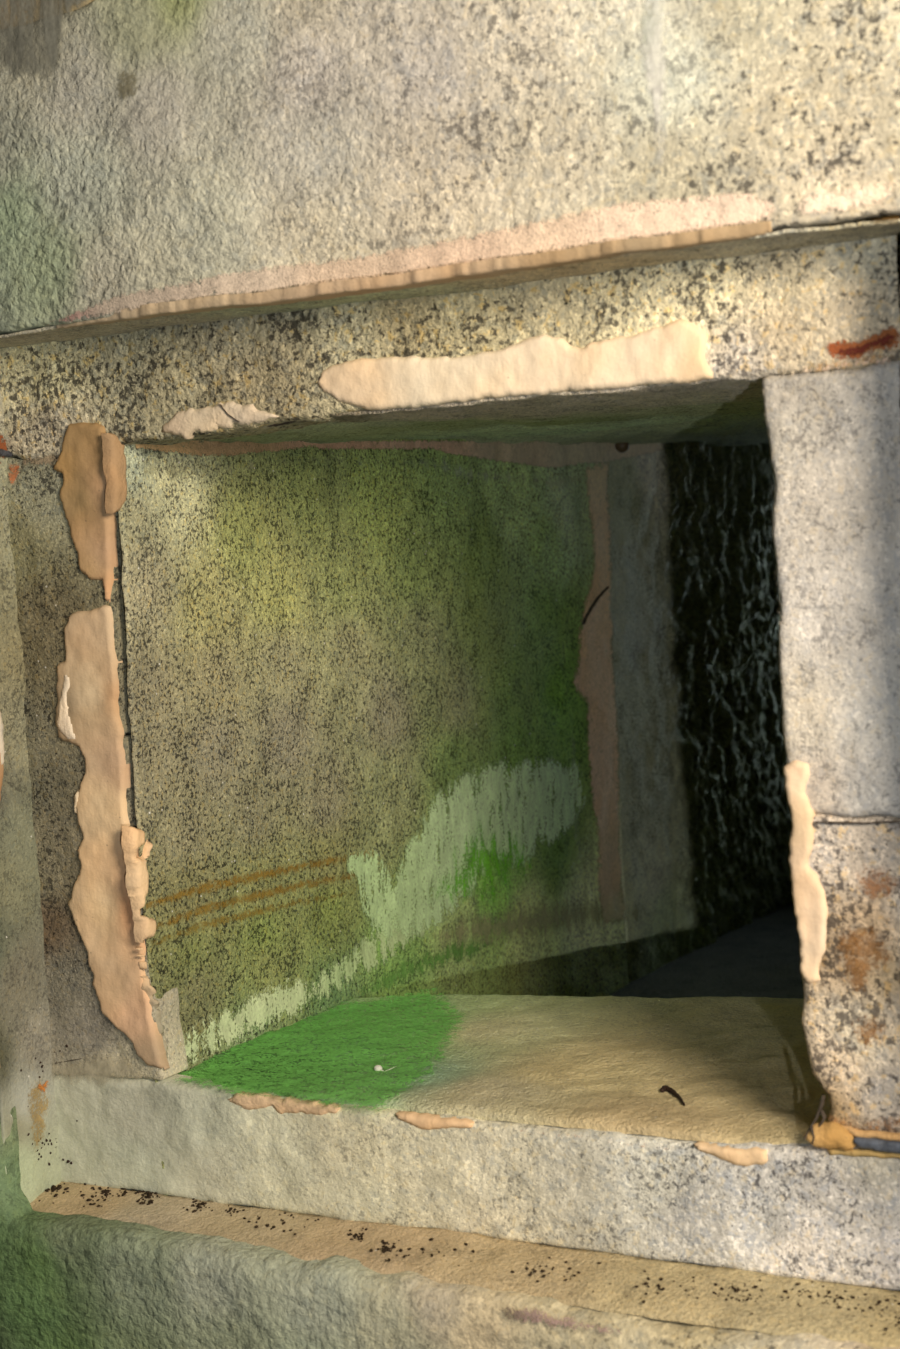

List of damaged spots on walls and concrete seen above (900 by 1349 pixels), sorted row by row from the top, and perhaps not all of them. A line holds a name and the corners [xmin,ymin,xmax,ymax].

damp [0,0,86,72]
crack [892,215,900,309]
rust [818,327,900,371]
rust [0,435,19,483]
peeling [101,433,127,514]
peeling [57,675,75,739]
crack [814,818,900,826]
peeling [121,826,168,1058]
peeling [827,1126,900,1159]